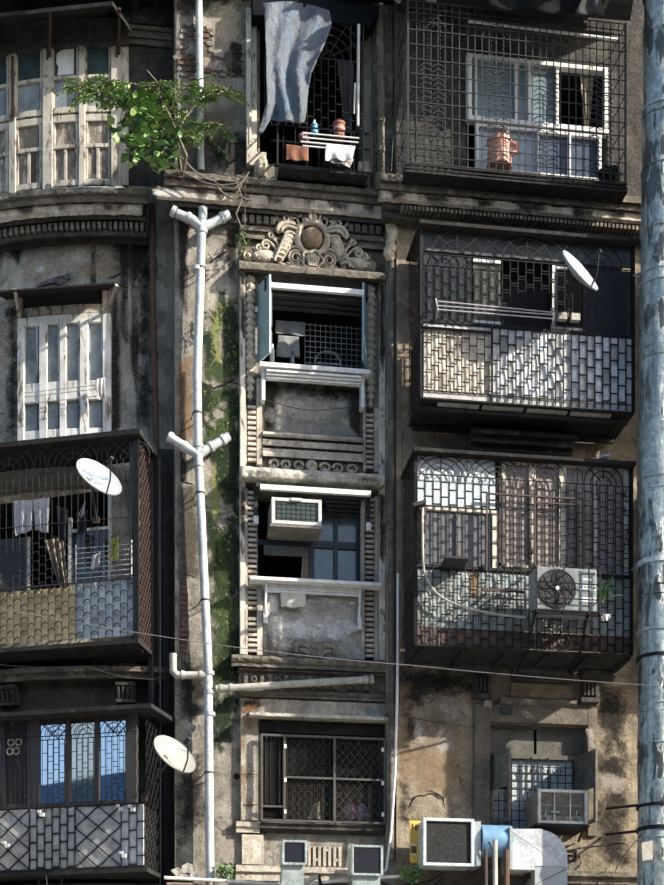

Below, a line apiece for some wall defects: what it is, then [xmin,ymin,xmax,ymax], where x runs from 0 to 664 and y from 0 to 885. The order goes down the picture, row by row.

flaking render [173,2,246,106]
leakage [110,237,152,431]
leakage [178,220,189,312]
leakage [202,228,245,384]
leakage [597,687,627,777]
crack [409,790,445,807]
leakage [598,788,629,868]